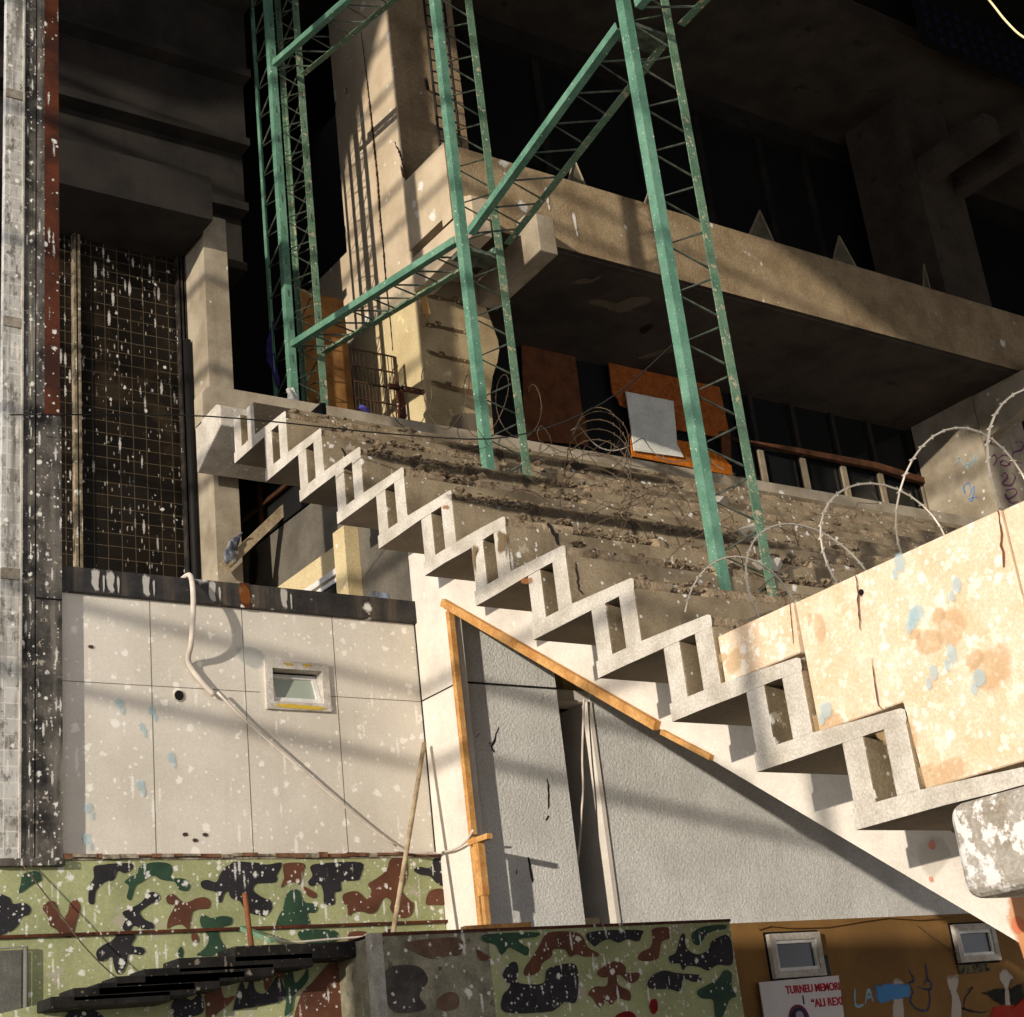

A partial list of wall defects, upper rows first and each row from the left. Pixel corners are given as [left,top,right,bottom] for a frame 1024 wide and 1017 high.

crack [997,510,1005,567]
crack [853,575,861,628]
crack [872,665,882,709]